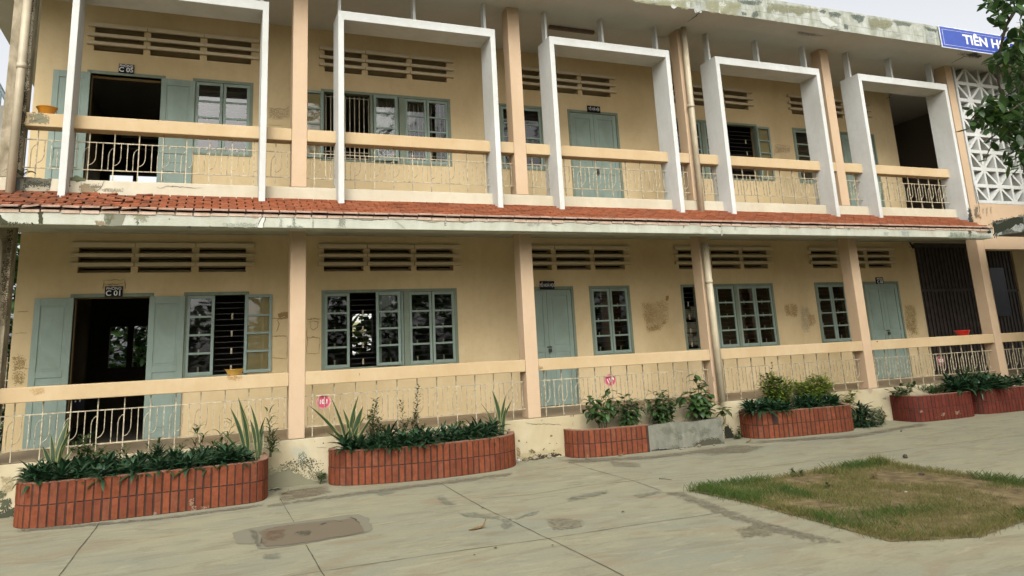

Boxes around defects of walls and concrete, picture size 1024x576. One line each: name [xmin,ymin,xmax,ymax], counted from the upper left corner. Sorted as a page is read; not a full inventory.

mould [819,10,865,30]